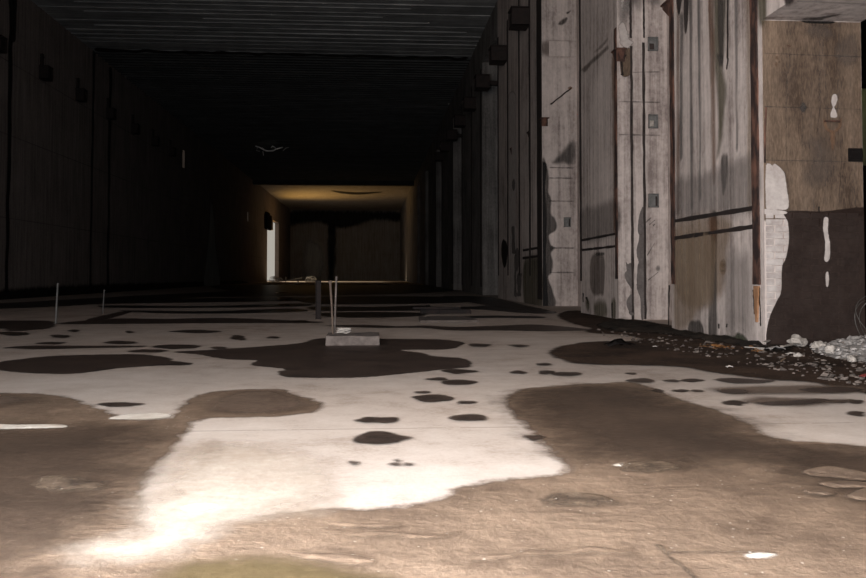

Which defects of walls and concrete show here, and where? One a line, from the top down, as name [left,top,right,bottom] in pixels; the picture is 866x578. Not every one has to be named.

leakage [0,0,207,300]
leakage [0,145,866,405]
leakage [676,0,701,207]
leakage [714,0,737,144]
leakage [758,0,766,24]
peeling [764,163,789,215]
leakage [830,94,838,118]
leakage [0,382,866,578]